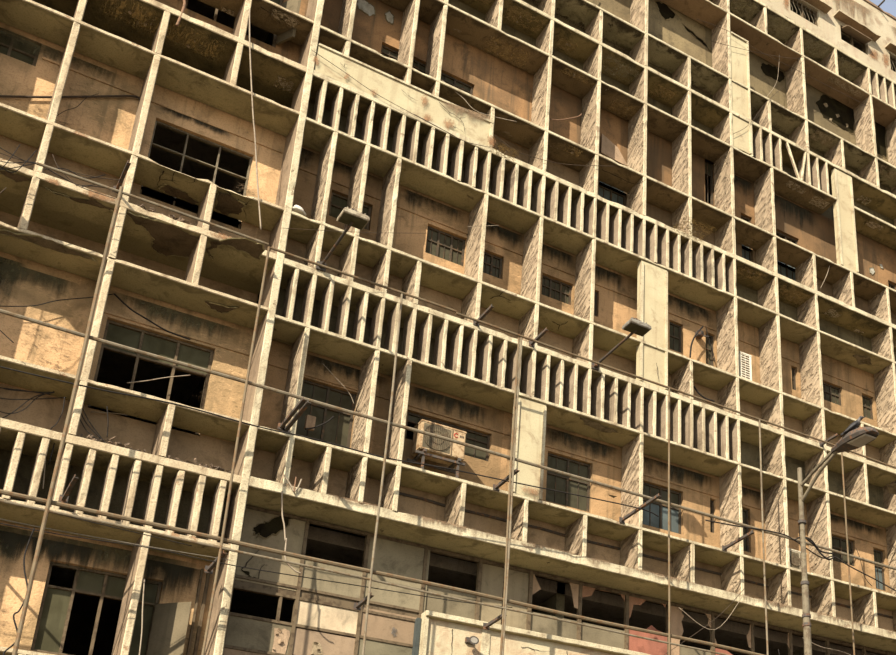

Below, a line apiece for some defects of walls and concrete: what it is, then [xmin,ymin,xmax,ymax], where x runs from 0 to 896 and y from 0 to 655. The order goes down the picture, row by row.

peeling [730,0,796,41]
peeling [829,57,865,97]
water stain [0,257,69,295]
water stain [415,387,485,418]
water stain [0,525,132,569]